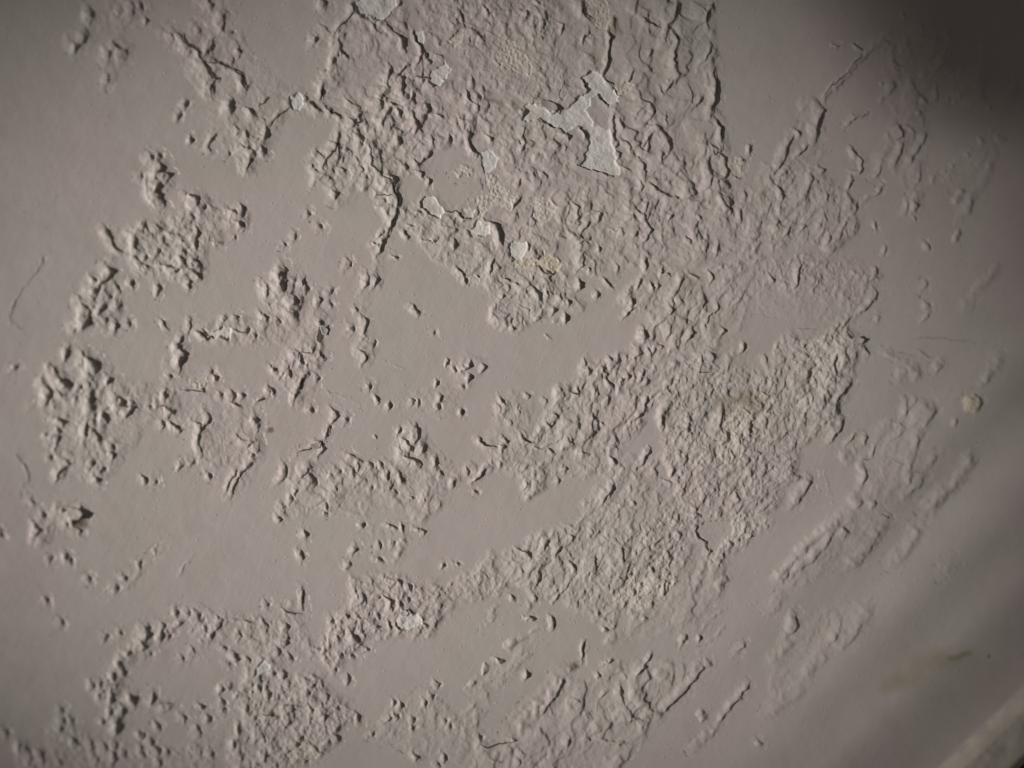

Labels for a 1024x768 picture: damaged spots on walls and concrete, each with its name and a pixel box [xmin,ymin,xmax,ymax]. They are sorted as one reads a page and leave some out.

spalling [354,0,397,21]
crack [407,71,431,83]
spalling [429,63,452,87]
crack [599,0,729,151]
spalling [523,70,634,177]
spalling [420,196,445,219]
spalling [453,149,517,238]
crack [713,187,740,222]
spalling [509,241,561,273]
spalling [716,391,774,465]
spalling [613,574,678,614]
spalling [395,608,422,630]